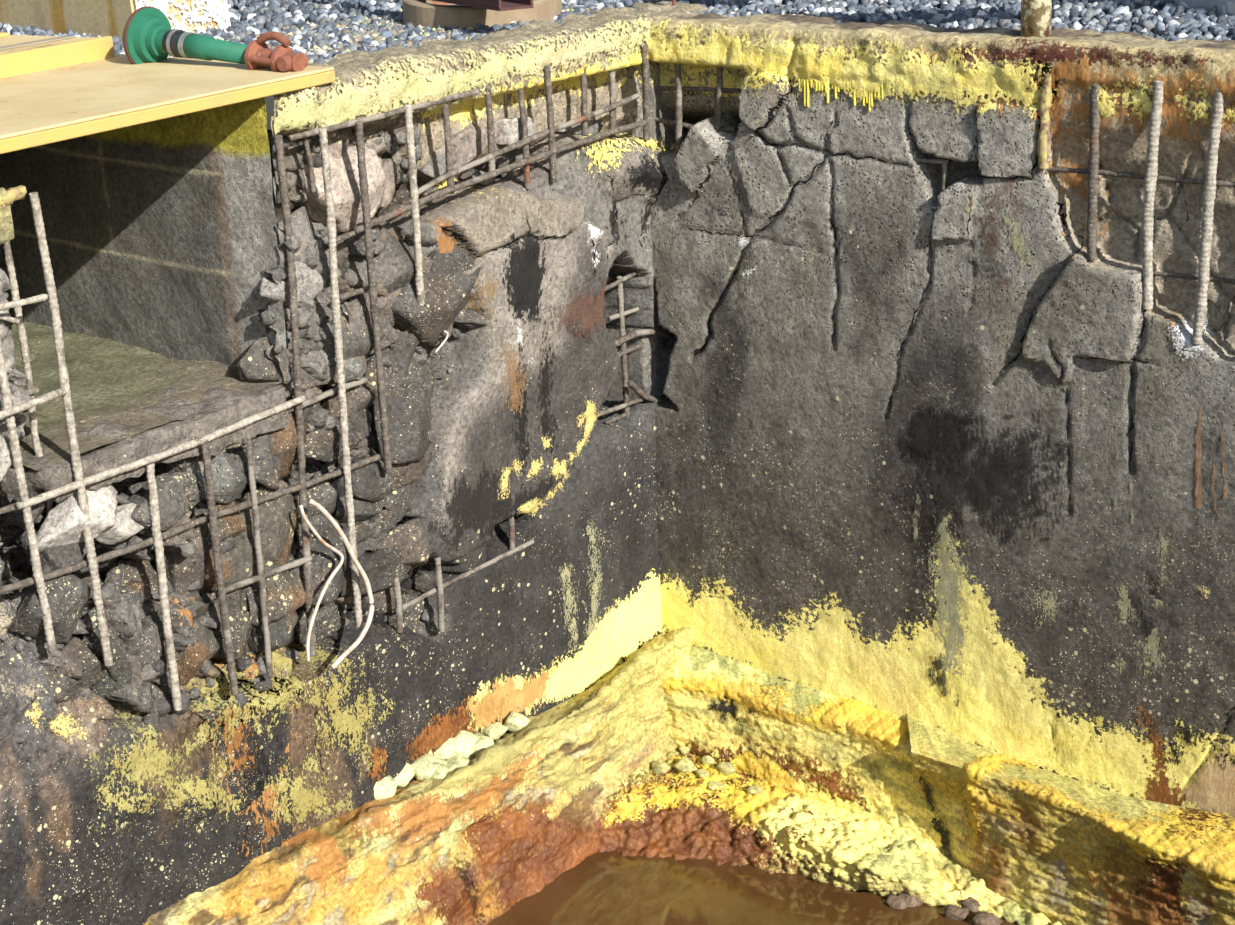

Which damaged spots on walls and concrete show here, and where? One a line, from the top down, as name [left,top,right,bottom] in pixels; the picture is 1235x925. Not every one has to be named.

spalling [0,44,749,728]
damp [583,219,605,269]
crack [442,76,906,359]
crack [888,209,937,407]
crack [975,79,1042,180]
crack [993,202,1084,386]
corrosion [903,36,1235,262]
crack [1051,277,1149,512]
spalling [1033,57,1235,349]
corrosion [404,663,556,762]
corrosion [190,702,879,925]
damp [467,382,1235,817]